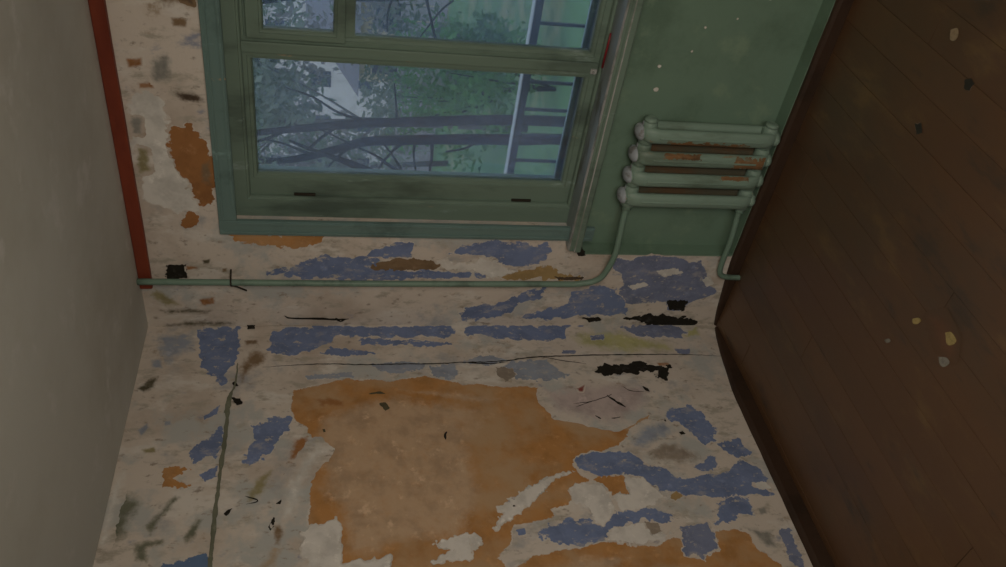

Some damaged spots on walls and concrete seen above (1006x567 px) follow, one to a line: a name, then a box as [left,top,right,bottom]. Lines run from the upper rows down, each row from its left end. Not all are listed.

peeling [165,122,217,230]
peeling [218,230,327,250]
spalling [165,264,200,279]
spalling [371,258,441,271]
spalling [496,264,586,281]
spalling [623,300,698,325]
crack [273,354,712,367]
spalling [595,348,691,381]
crack [575,386,649,419]
peeling [161,465,219,489]
crack [208,363,243,567]
peeling [288,355,784,567]